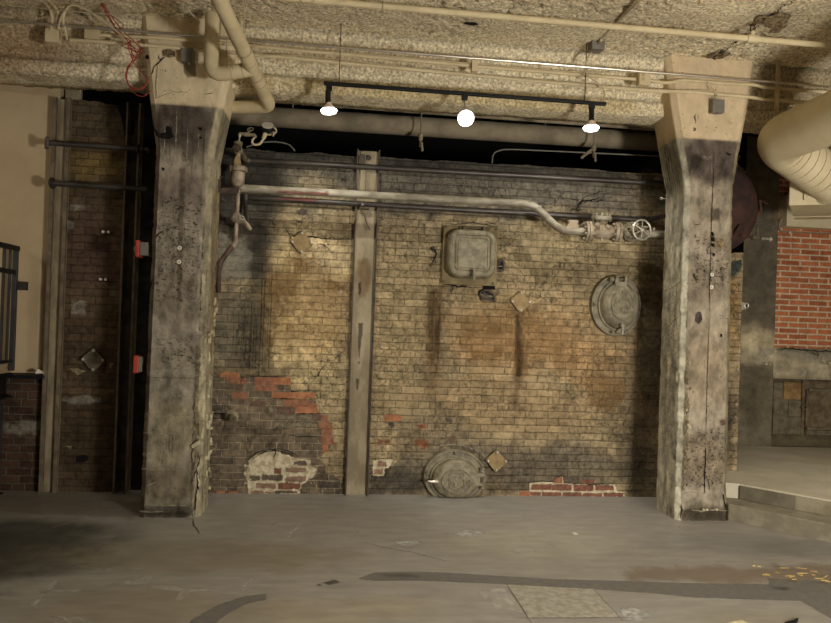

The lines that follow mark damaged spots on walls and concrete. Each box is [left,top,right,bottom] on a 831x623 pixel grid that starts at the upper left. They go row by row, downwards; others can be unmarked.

spalling [150,196,203,303]
crack [570,191,607,211]
peeling [157,298,343,494]
flaking render [520,476,624,497]